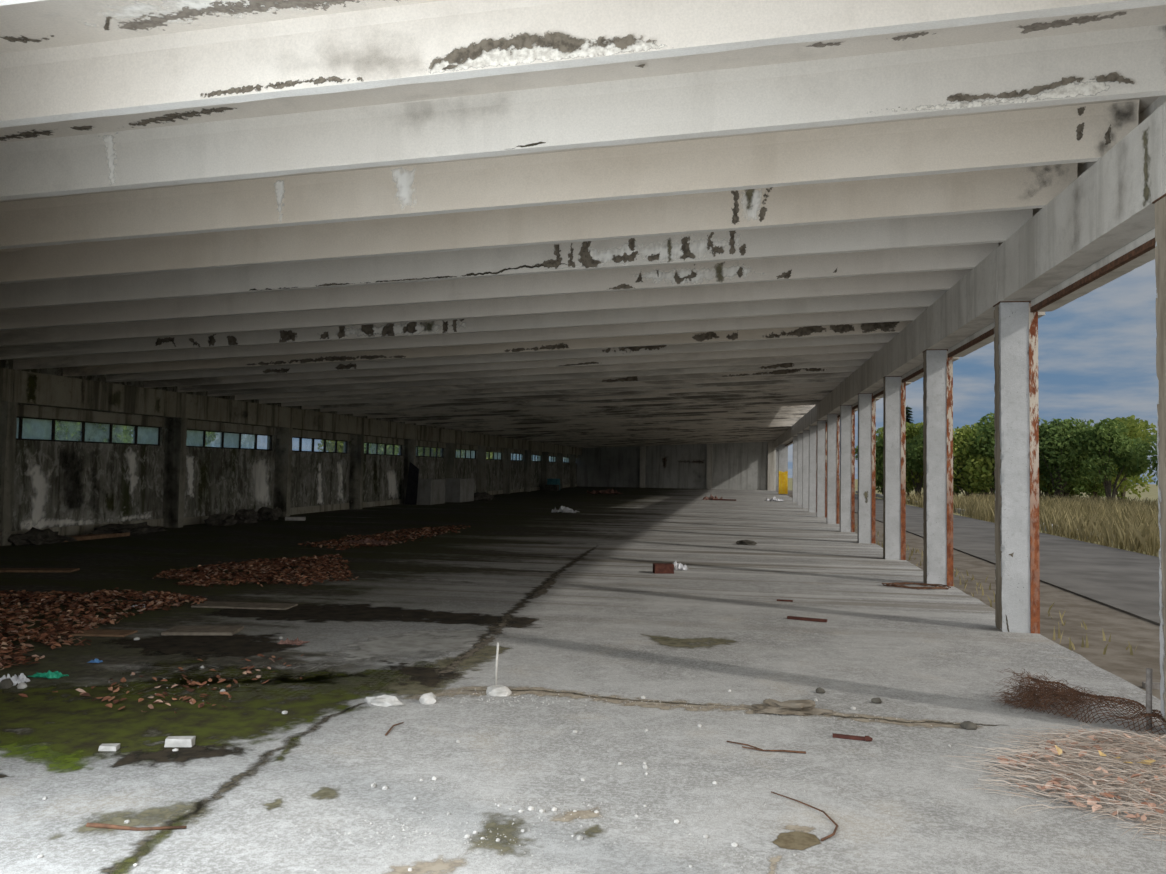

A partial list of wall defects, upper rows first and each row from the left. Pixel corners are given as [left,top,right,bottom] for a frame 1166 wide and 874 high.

peeling [1,35,54,43]
peeling [104,0,360,31]
spalling [429,32,666,74]
peeling [892,32,936,41]
peeling [1019,12,1126,34]
spalling [871,72,1134,112]
peeling [0,129,53,141]
peeling [129,107,237,128]
damp [21,449,151,530]
damp [164,420,194,524]
damp [252,460,286,511]
crack [101,703,364,874]